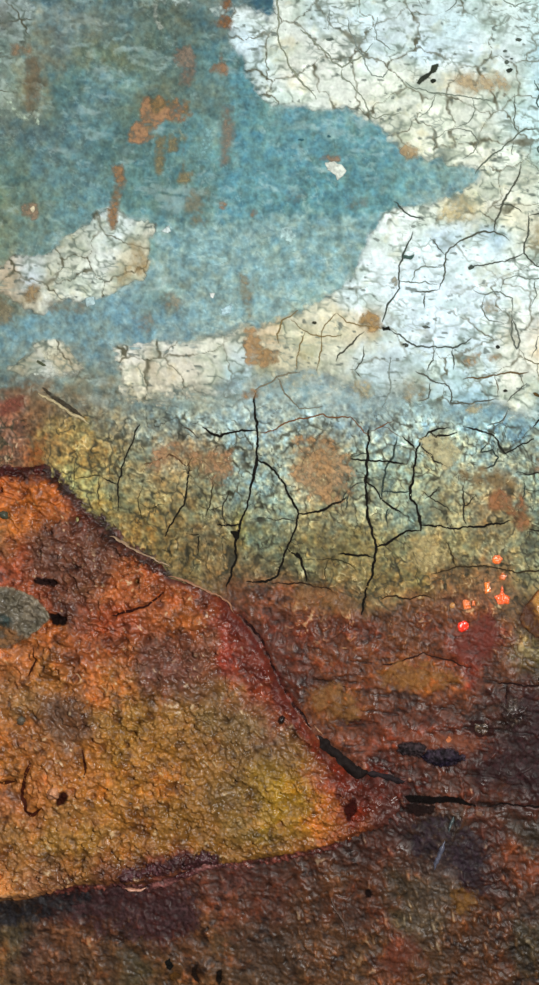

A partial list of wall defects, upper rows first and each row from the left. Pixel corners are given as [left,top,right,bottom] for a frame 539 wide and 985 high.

corrosion [108,166,124,228]
peeling [26,284,39,302]
crack [74,0,539,616]